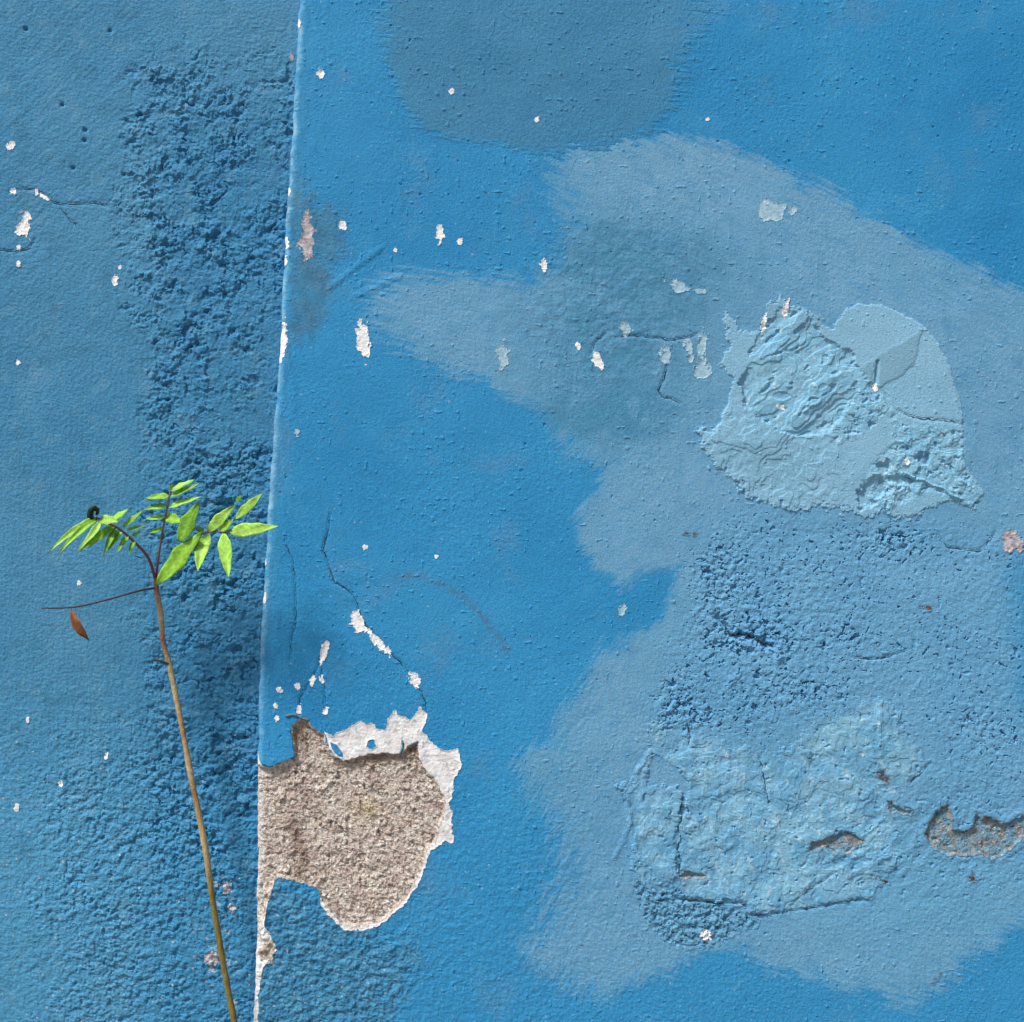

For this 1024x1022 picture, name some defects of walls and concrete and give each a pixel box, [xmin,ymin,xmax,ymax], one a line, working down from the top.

peeling [284,209,317,266]
peeling [758,199,798,222]
peeling [355,318,372,365]
crack [590,334,693,355]
peeling [1002,530,1024,559]
crack [322,516,426,710]
spalling [254,640,463,1022]
peeling [614,699,931,951]
peeling [924,803,1024,860]